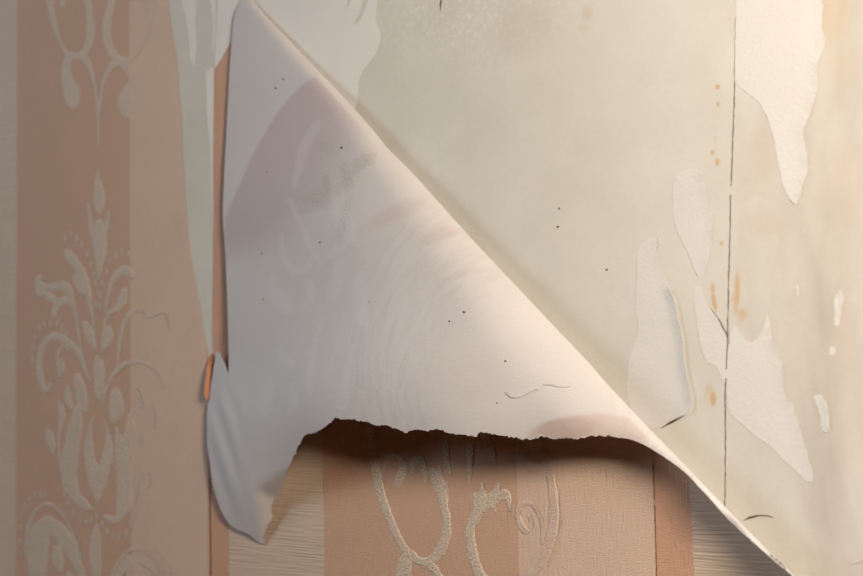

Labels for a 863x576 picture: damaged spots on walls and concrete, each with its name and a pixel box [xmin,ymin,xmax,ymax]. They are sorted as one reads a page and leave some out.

peeling [735,0,825,204]
peeling [204,0,794,576]
peeling [693,285,814,482]
peeling [813,394,829,433]
peeling [833,290,844,326]